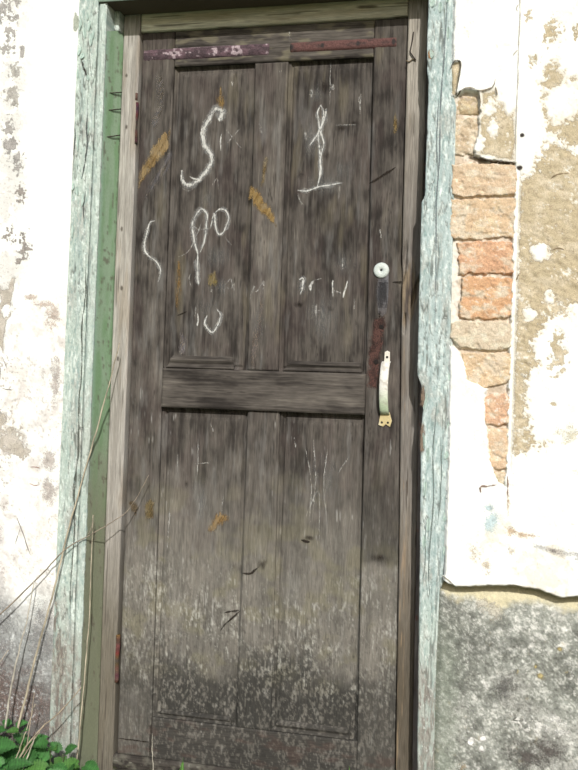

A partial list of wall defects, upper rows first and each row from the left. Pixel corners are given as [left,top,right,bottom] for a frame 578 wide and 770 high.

peeling [0,0,24,107]
flaking render [543,18,578,50]
peeling [1,114,26,204]
flaking render [0,227,33,350]
flaking render [450,54,578,484]
corrosion [367,317,385,388]
flaking render [0,409,31,460]